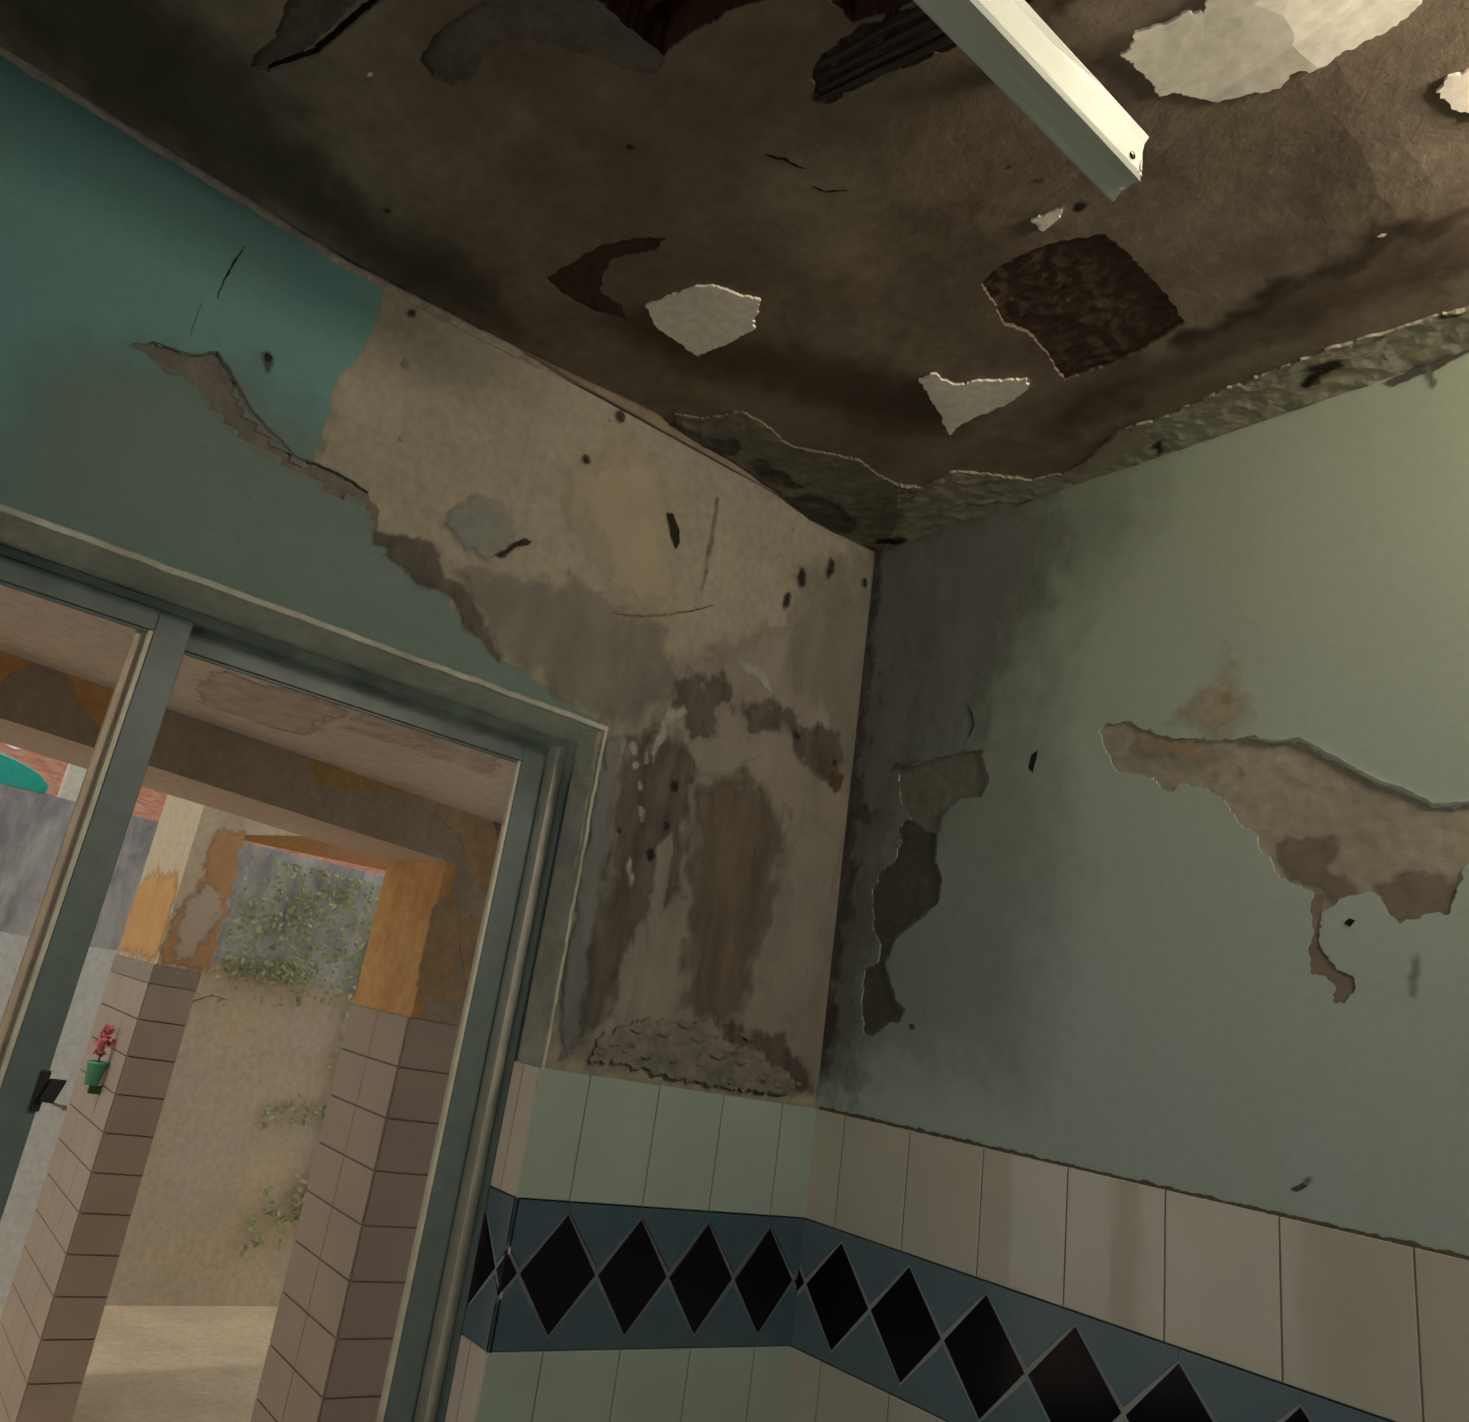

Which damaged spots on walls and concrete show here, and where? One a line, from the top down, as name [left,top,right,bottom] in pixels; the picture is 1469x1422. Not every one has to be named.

crack [269,0,378,68]
spalling [599,0,761,56]
spalling [812,0,953,104]
peeling [1121,0,1422,102]
peeling [1436,68,1469,113]
spalling [547,237,662,318]
spalling [982,206,1184,378]
peeling [131,284,1469,1108]
leakage [578,504,1045,1091]